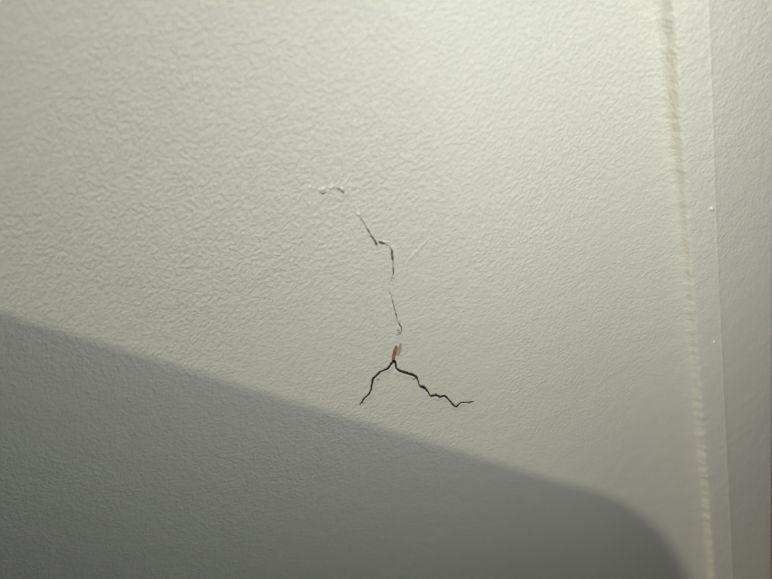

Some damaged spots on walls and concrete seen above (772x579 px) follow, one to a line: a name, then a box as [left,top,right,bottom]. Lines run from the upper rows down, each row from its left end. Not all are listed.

crack [356,212,474,410]